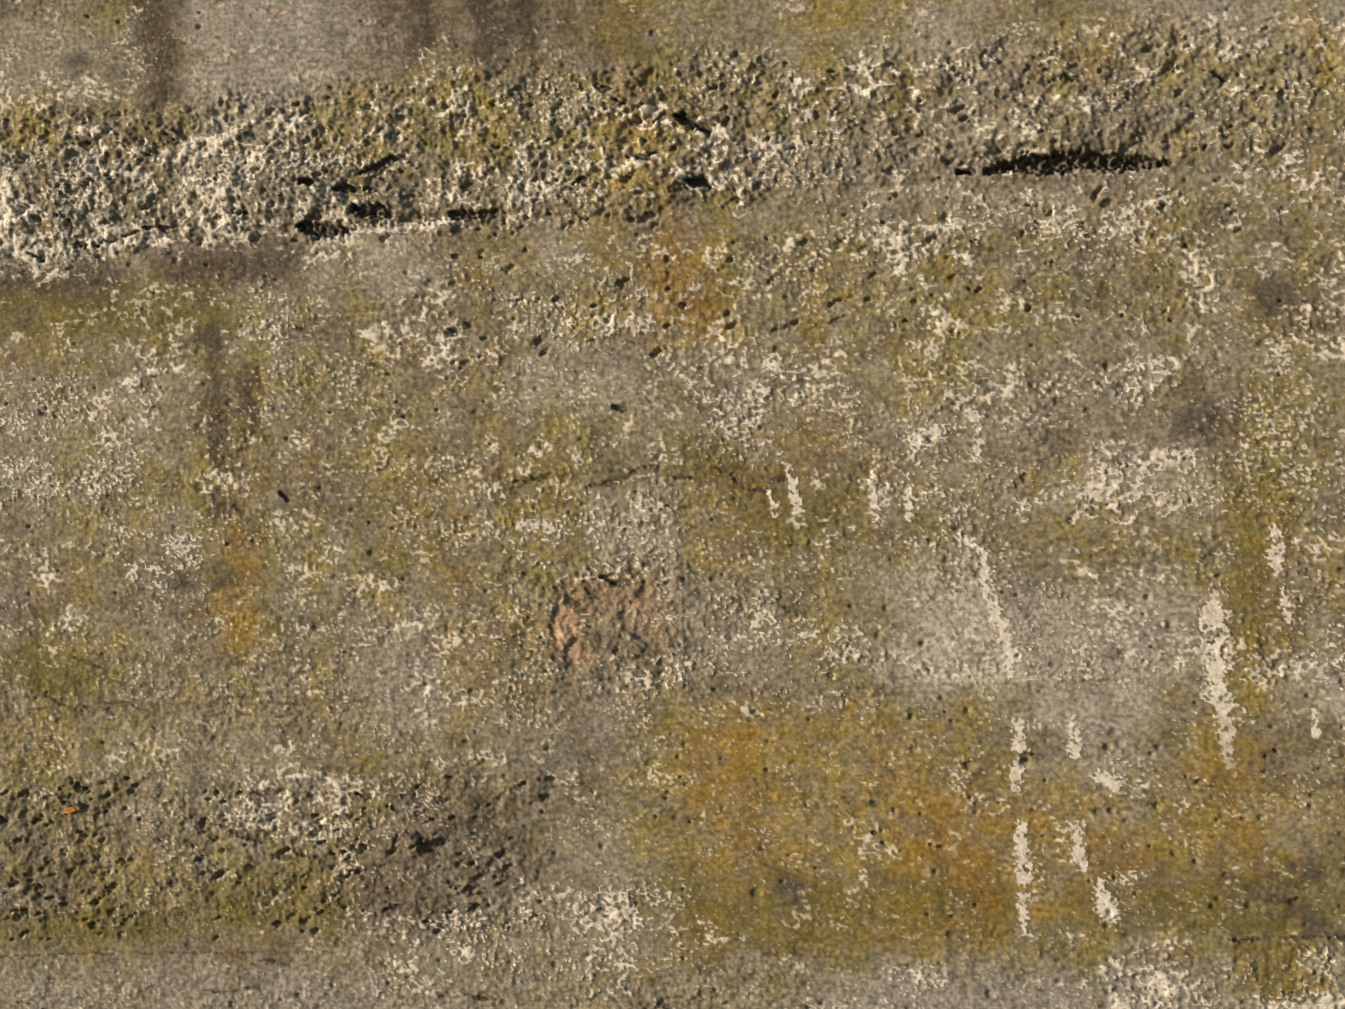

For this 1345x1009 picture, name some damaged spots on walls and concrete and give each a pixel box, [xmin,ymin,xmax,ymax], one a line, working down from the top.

leakage [766,461,805,518]
leakage [866,466,883,522]
leakage [899,420,942,522]
leakage [964,406,985,463]
leakage [955,528,1026,680]
leakage [1264,523,1293,624]
leakage [1196,582,1246,769]
leakage [1009,717,1030,792]
leakage [1063,715,1090,759]
leakage [1090,762,1126,794]
leakage [1013,819,1036,941]
leakage [1070,820,1119,931]